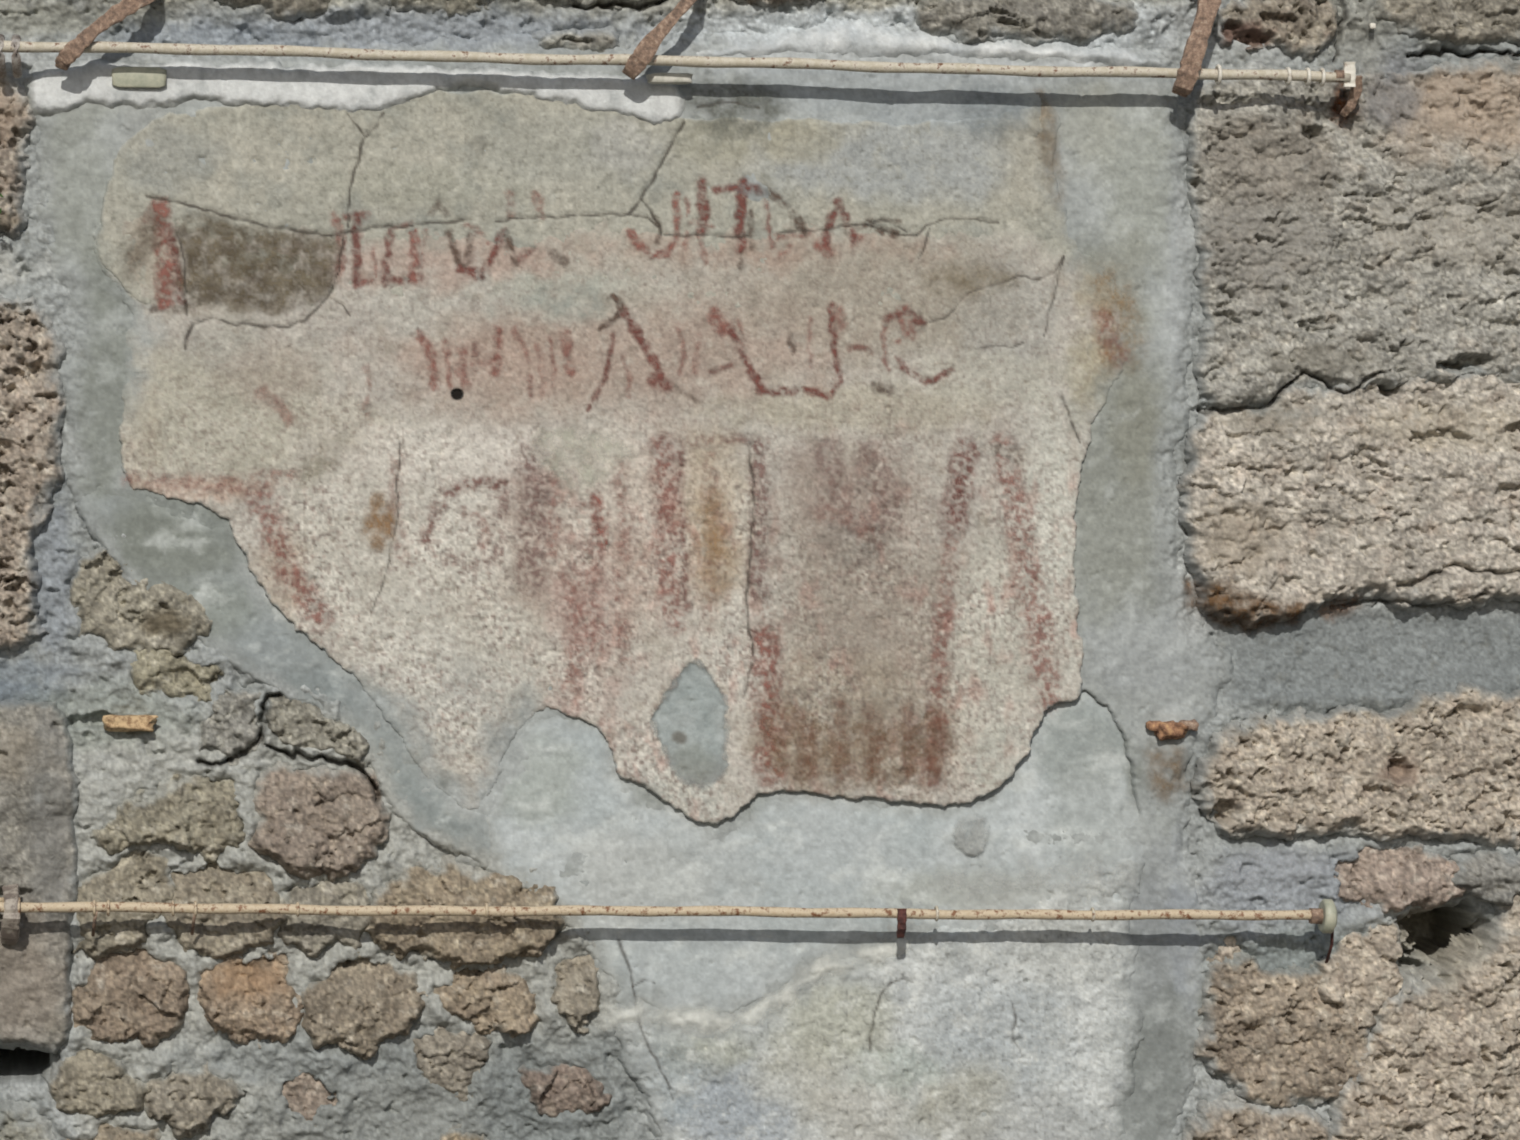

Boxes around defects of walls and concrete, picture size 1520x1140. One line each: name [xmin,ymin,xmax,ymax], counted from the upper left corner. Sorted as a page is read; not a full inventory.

crack [147,102,759,339]
spalling [75,486,1145,1014]